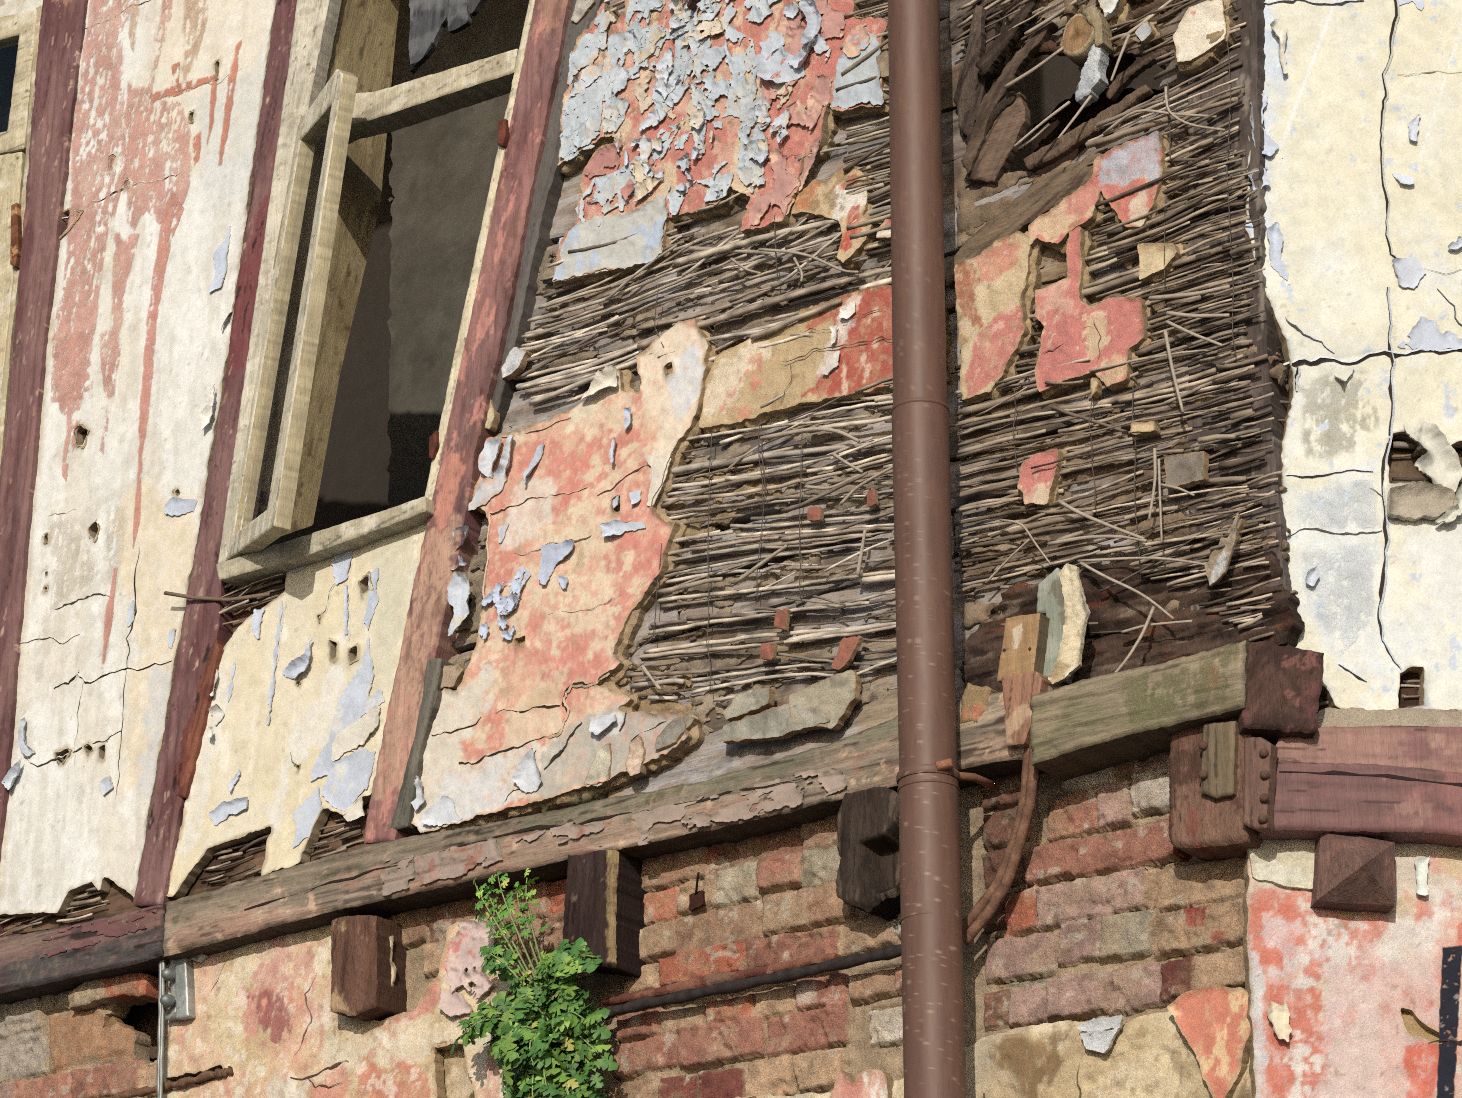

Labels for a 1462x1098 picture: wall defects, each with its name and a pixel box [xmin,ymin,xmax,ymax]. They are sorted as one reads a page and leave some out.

peeling [209,226,236,330]
spalling [949,0,1290,672]
crack [1264,0,1462,682]
peeling [447,400,574,640]
peeling [1404,421,1462,524]
crack [20,547,172,799]
spalling [184,832,271,897]
spalling [164,565,312,725]
peeling [292,550,385,862]
peeling [410,776,463,826]
spalling [441,664,466,690]
crack [244,672,824,911]